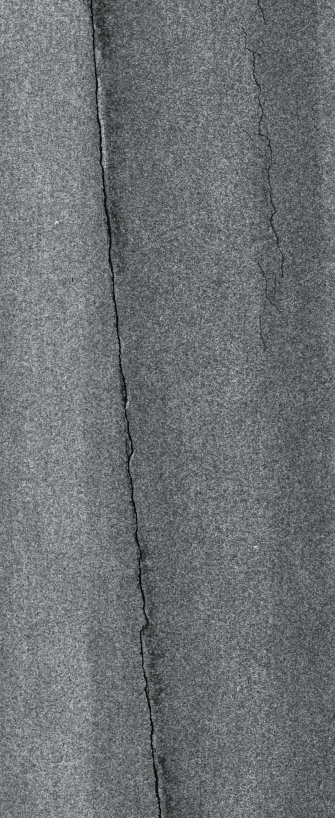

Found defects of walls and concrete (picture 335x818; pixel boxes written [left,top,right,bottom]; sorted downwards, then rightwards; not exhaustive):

crack [90,0,162,818]
crack [241,27,284,353]